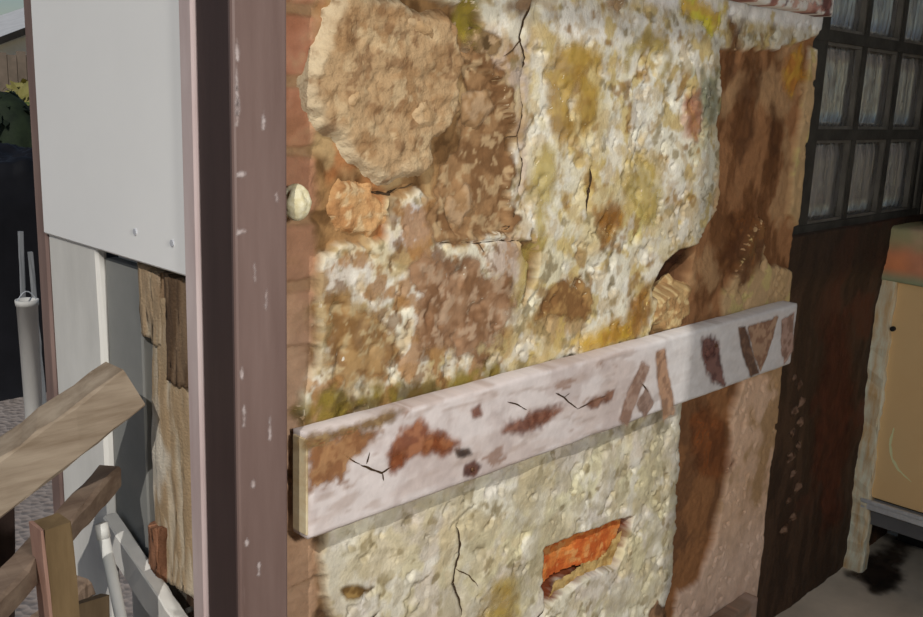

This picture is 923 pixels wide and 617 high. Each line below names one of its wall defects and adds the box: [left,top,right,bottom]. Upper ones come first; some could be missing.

crack [505,4,531,67]
leakage [681,0,740,77]
flaking render [426,25,522,245]
crack [505,92,523,186]
leakage [731,63,759,153]
leakage [766,109,784,186]
crack [441,213,518,251]
leakage [719,210,766,285]
flaking render [408,254,517,363]
peeling [620,349,675,426]
crack [452,527,478,615]
spalling [542,519,622,599]